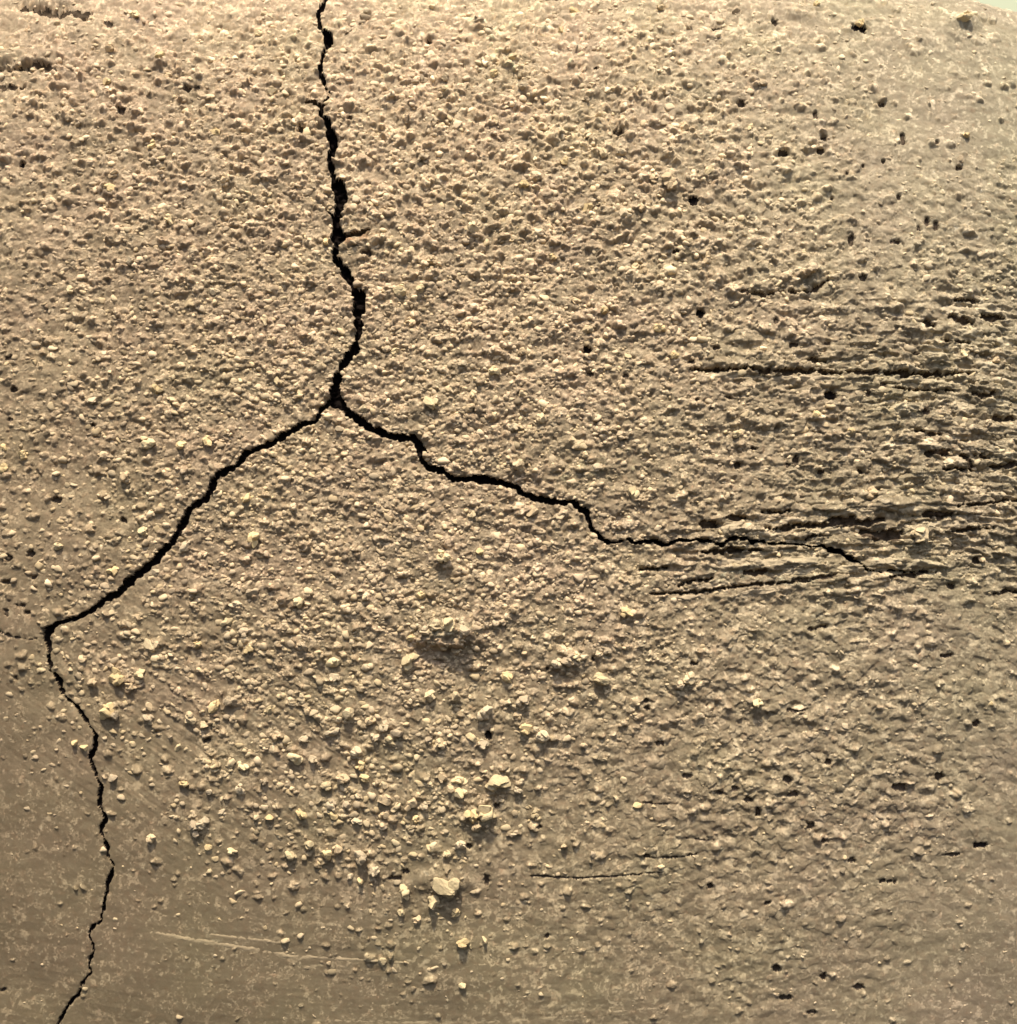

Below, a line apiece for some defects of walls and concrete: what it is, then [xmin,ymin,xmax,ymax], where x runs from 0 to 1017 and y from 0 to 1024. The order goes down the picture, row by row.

crack [43,400,330,1024]
crack [304,0,882,573]
crack [530,838,714,880]
crack [887,567,925,575]